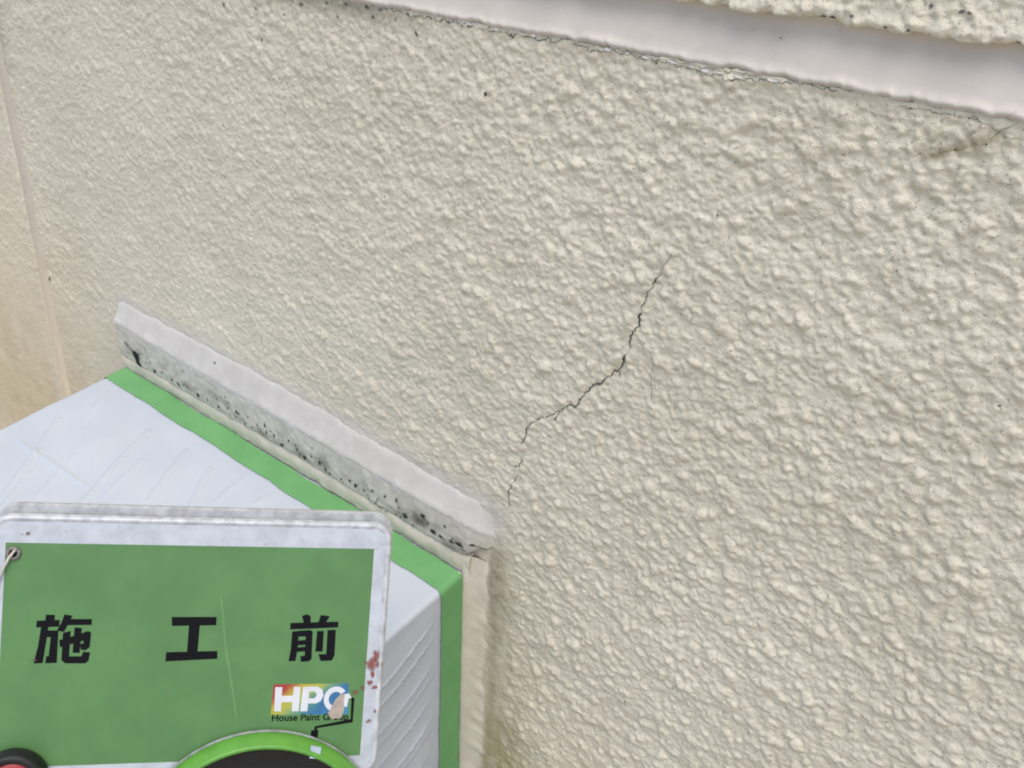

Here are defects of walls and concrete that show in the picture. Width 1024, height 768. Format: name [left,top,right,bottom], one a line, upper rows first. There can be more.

damp [127,352,475,548]
crack [507,256,672,507]